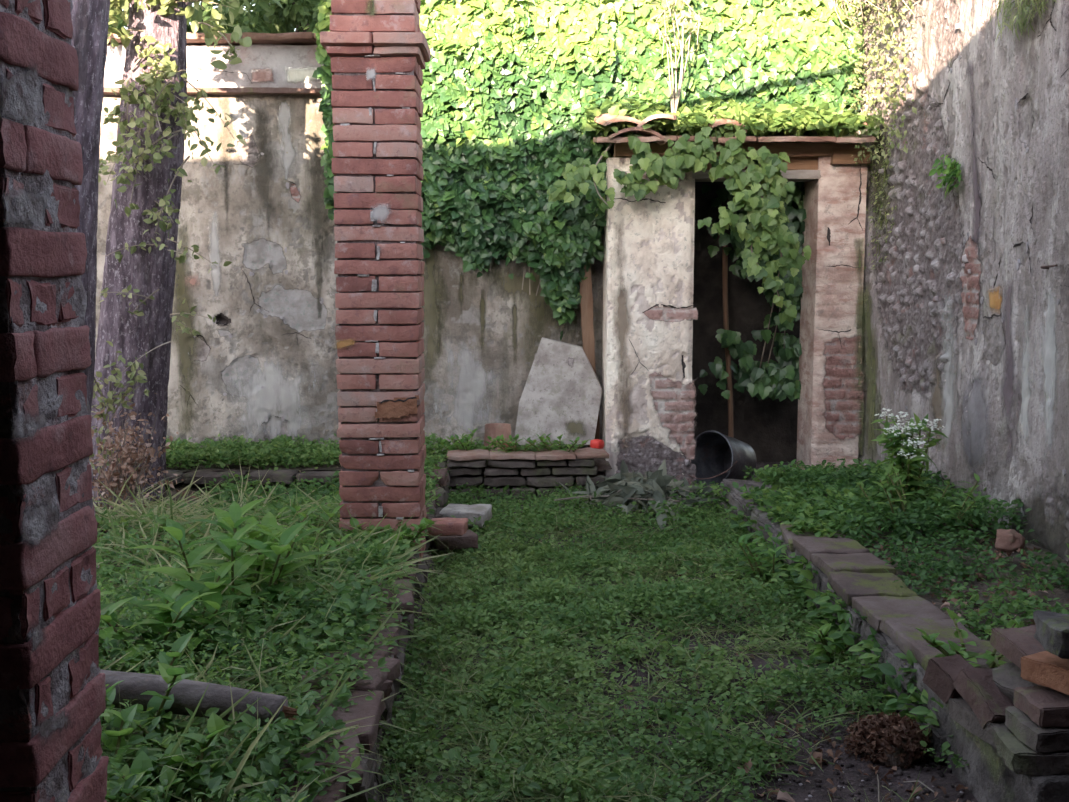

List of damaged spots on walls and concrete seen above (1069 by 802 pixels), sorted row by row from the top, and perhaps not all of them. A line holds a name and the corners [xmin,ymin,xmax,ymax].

spalling [931,0,963,73]
water stain [171,225,198,432]
water stain [210,220,220,295]
water stain [219,97,295,225]
water stain [238,364,301,435]
water stain [306,112,329,316]
spalling [613,363,696,485]
spalling [642,301,698,324]
spalling [820,327,865,440]
spalling [867,51,1006,394]